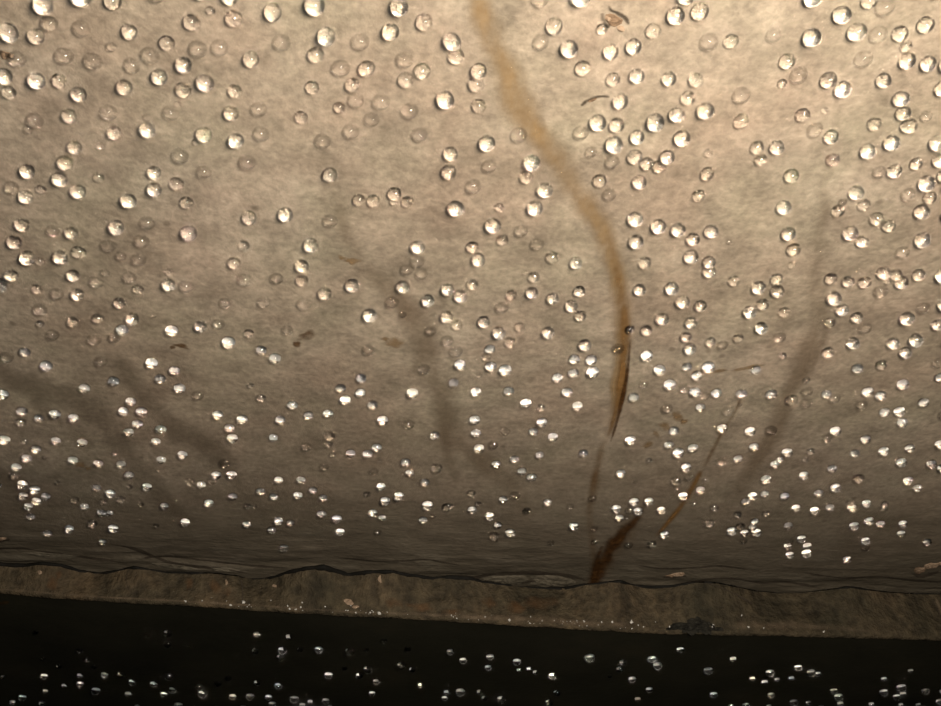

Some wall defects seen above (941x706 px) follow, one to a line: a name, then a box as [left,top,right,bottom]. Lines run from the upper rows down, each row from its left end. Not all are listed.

rust [579,198,630,436]
rust [660,472,701,532]
rust [590,515,640,583]